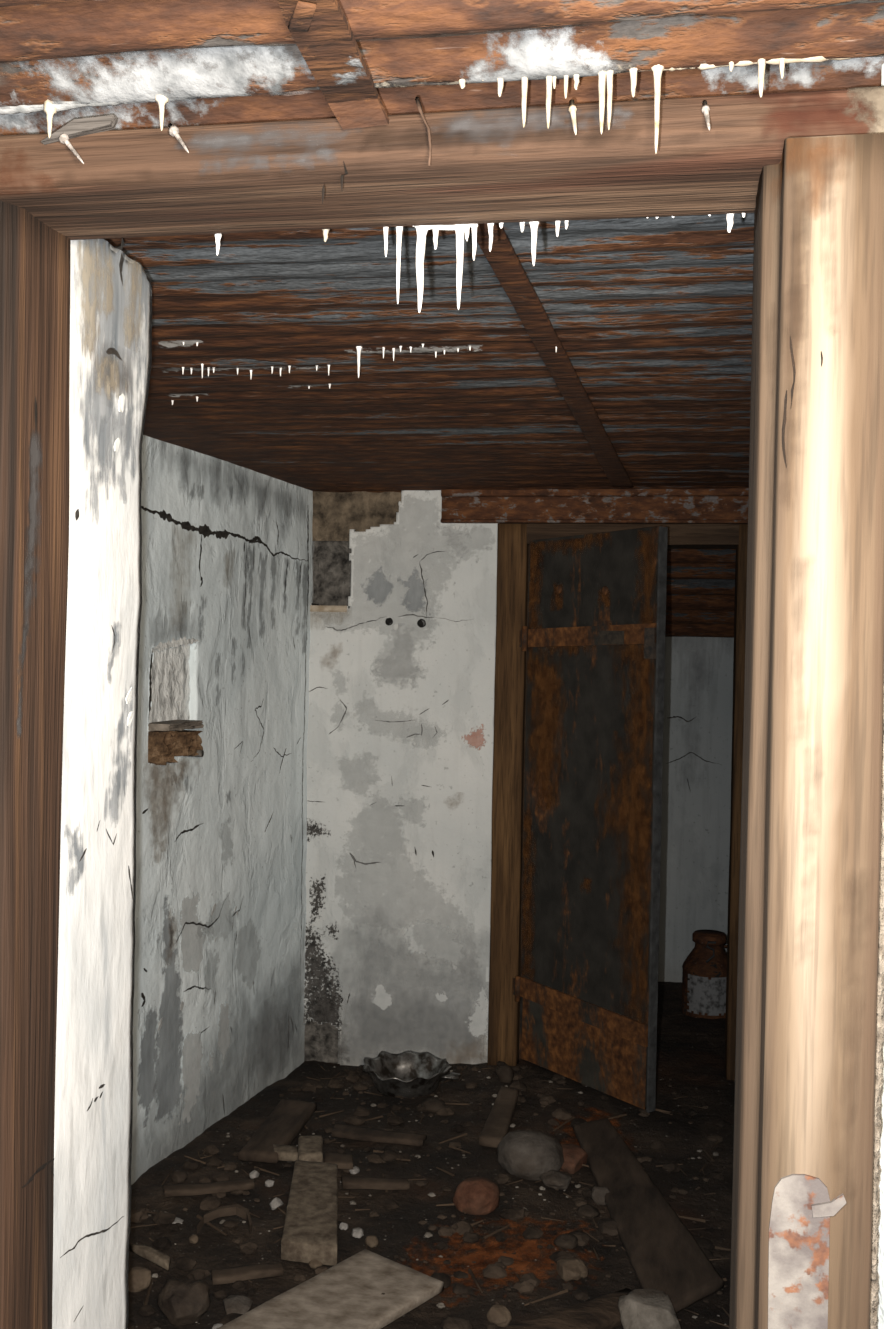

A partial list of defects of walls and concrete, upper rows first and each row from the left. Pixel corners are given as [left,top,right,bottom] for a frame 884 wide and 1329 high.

damp [0,44,310,134]
damp [366,24,884,134]
damp [158,340,203,348]
damp [345,344,482,354]
flaking render [312,491,402,541]
crack [141,506,472,859]
damp [307,818,331,842]
damp [304,877,343,1039]
crack [60,1216,124,1258]